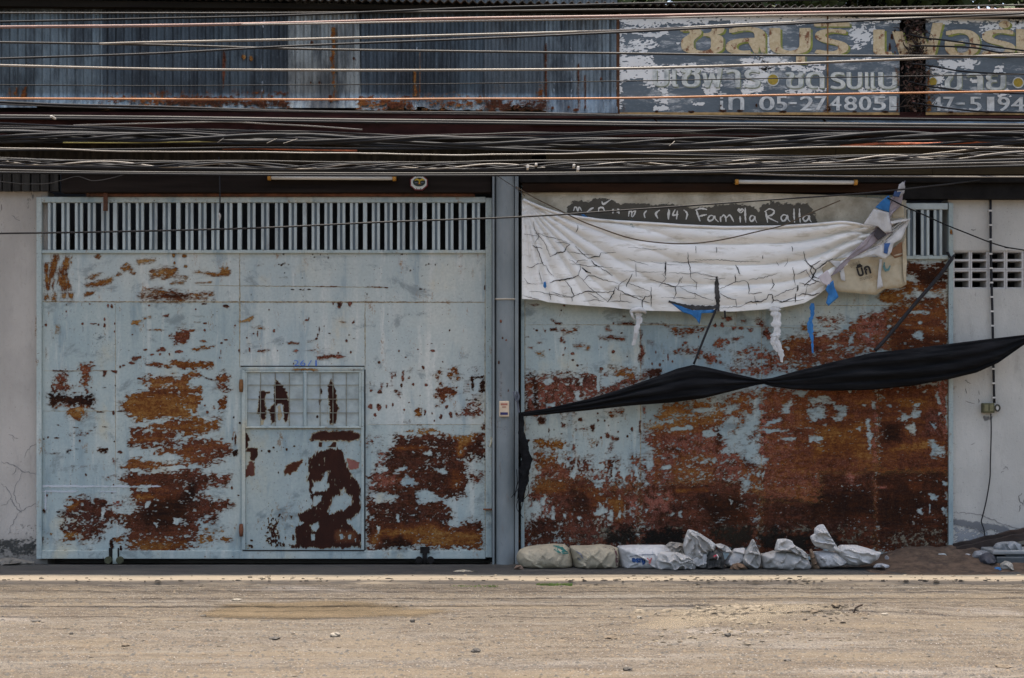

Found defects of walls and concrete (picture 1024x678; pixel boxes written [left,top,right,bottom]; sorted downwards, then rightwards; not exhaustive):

peeling [616,10,901,111]
peeling [931,58,980,89]
peeling [926,18,1024,41]
rust [44,253,231,335]
rust [42,322,241,551]
rust [366,343,486,551]
rust [508,260,948,556]